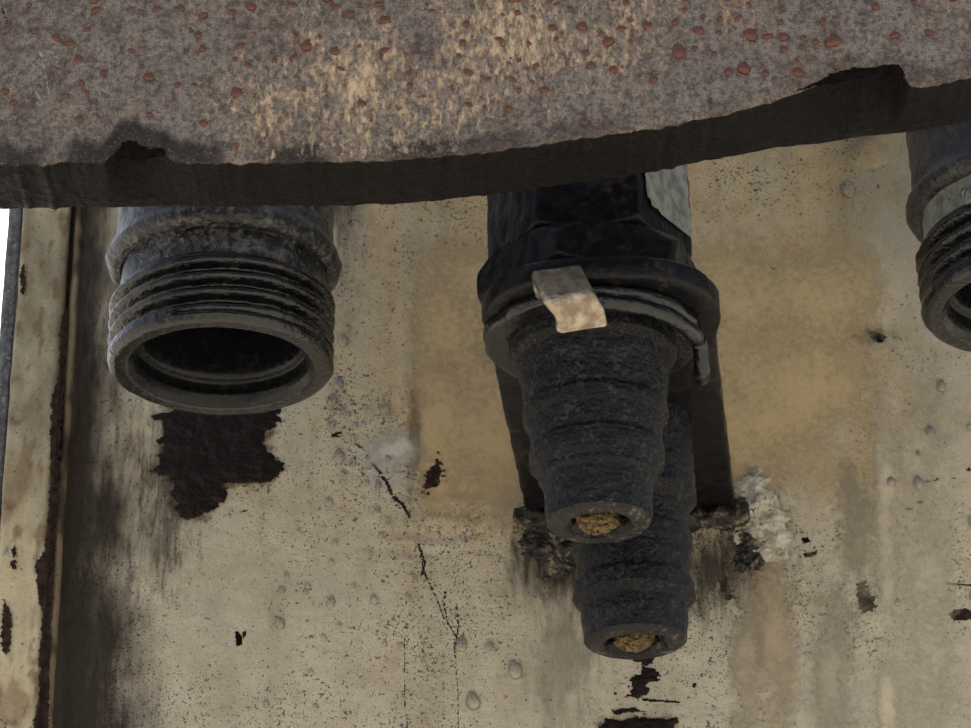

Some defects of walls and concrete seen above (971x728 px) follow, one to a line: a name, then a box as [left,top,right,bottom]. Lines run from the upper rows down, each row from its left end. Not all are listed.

corrosion [226,0,659,159]
crack [402,638,410,728]
crack [417,543,459,728]